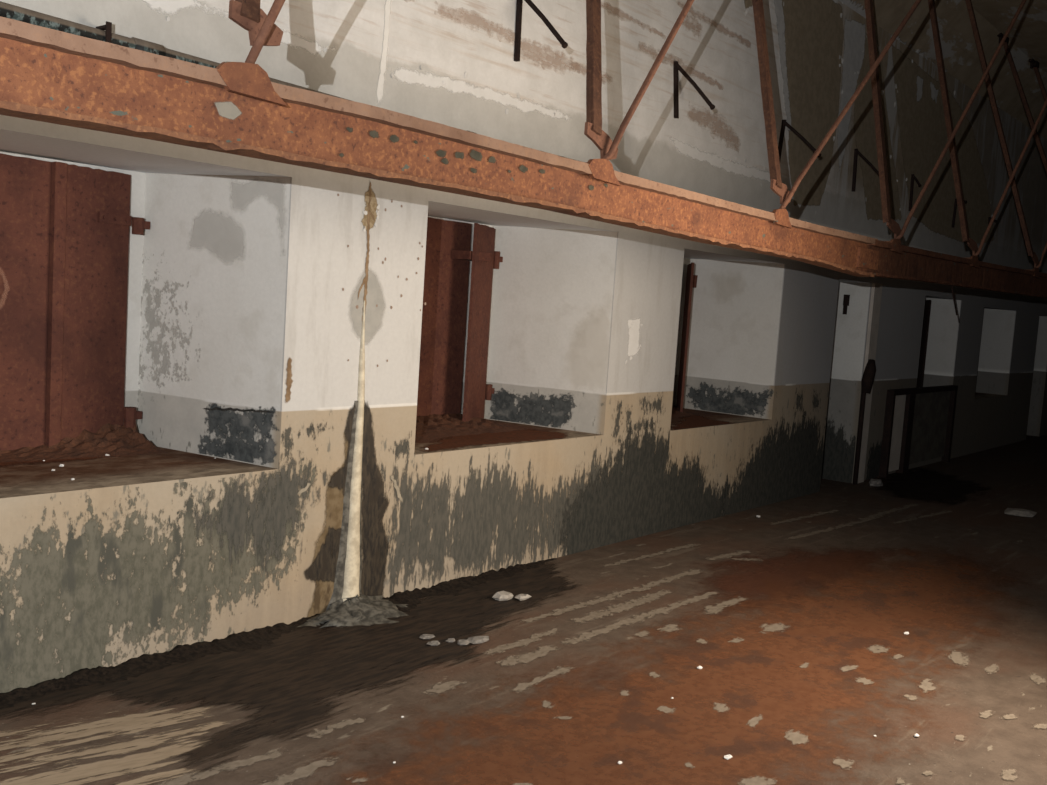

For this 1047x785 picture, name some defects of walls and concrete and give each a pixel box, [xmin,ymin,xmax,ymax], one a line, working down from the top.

flaking render [670,137,770,186]
peeling [782,0,994,248]
damp [0,270,856,785]
damp [772,442,990,540]